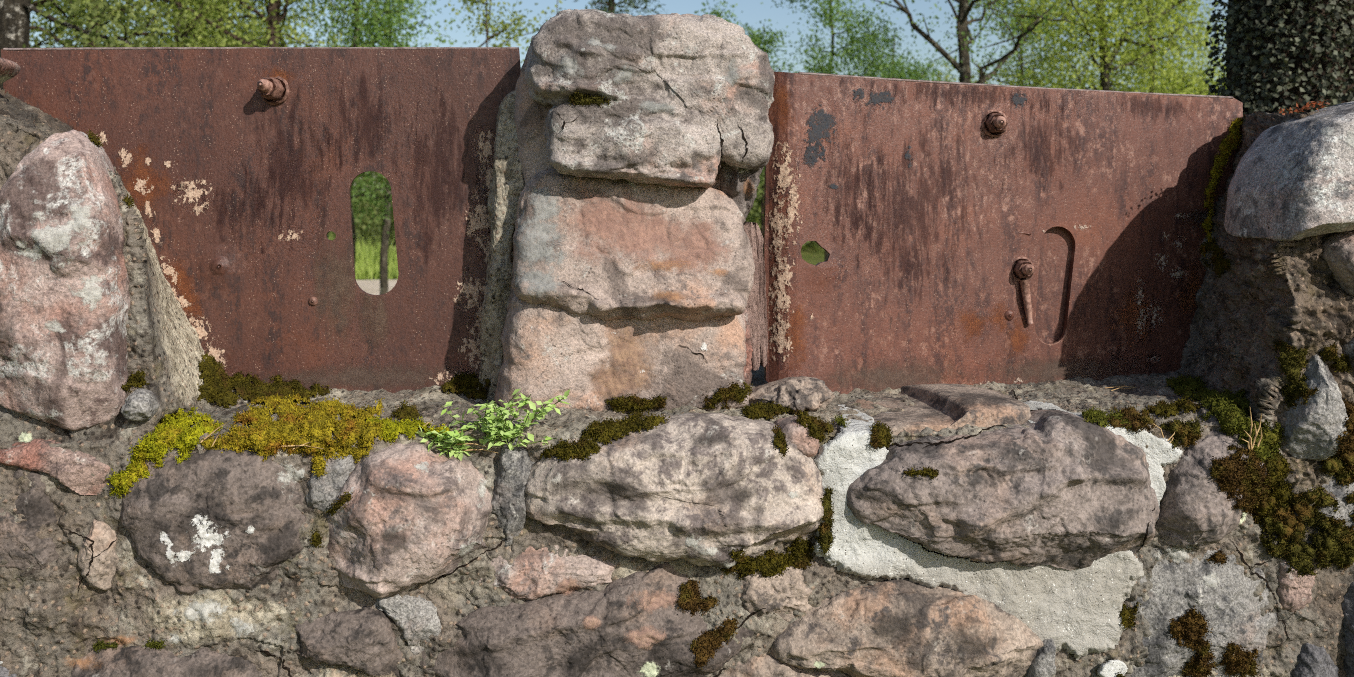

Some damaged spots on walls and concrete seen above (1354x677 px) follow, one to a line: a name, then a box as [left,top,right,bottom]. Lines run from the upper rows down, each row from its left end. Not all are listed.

peeling [852,88,895,109]
crack [717,121,748,175]
rust [128,150,164,205]
peeling [95,131,227,367]
peeling [429,128,494,385]
peeling [767,103,837,362]
rust [169,267,200,315]
crack [886,390,1018,448]